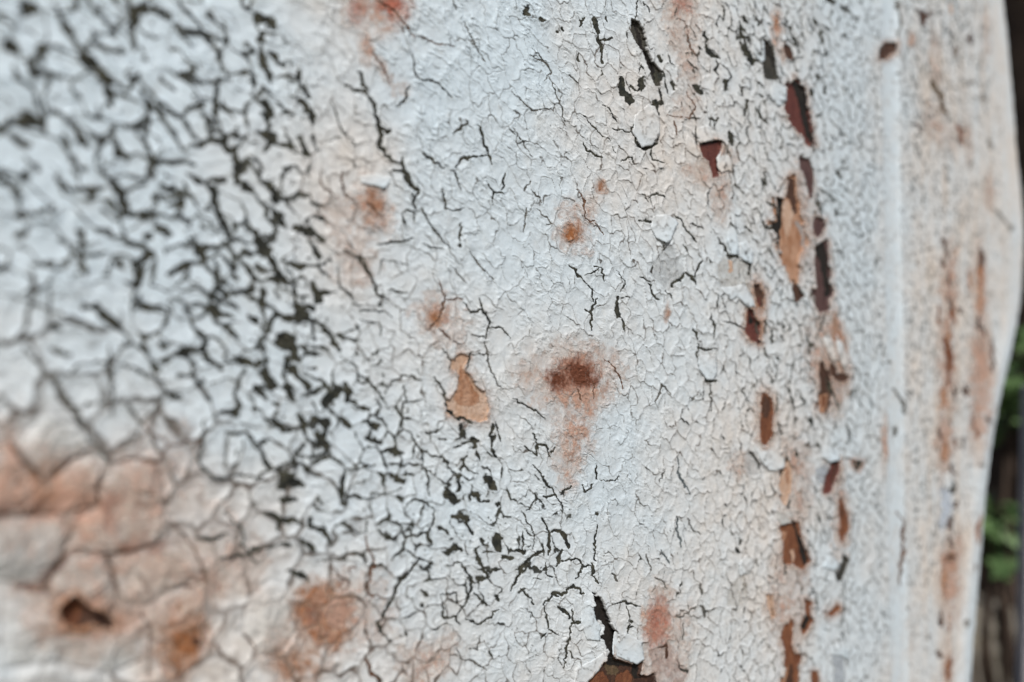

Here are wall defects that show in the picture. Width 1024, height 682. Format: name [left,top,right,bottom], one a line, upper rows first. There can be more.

rust [561,204,590,243]
crack [568,192,751,333]
peeling [753,39,835,314]
crack [0,272,255,507]
crack [316,0,701,681]
rust [524,344,614,482]
crack [654,313,745,412]
peeling [749,393,811,569]
peeling [817,444,862,581]
rust [274,582,369,677]
peeling [574,593,689,682]
rust [641,592,680,656]